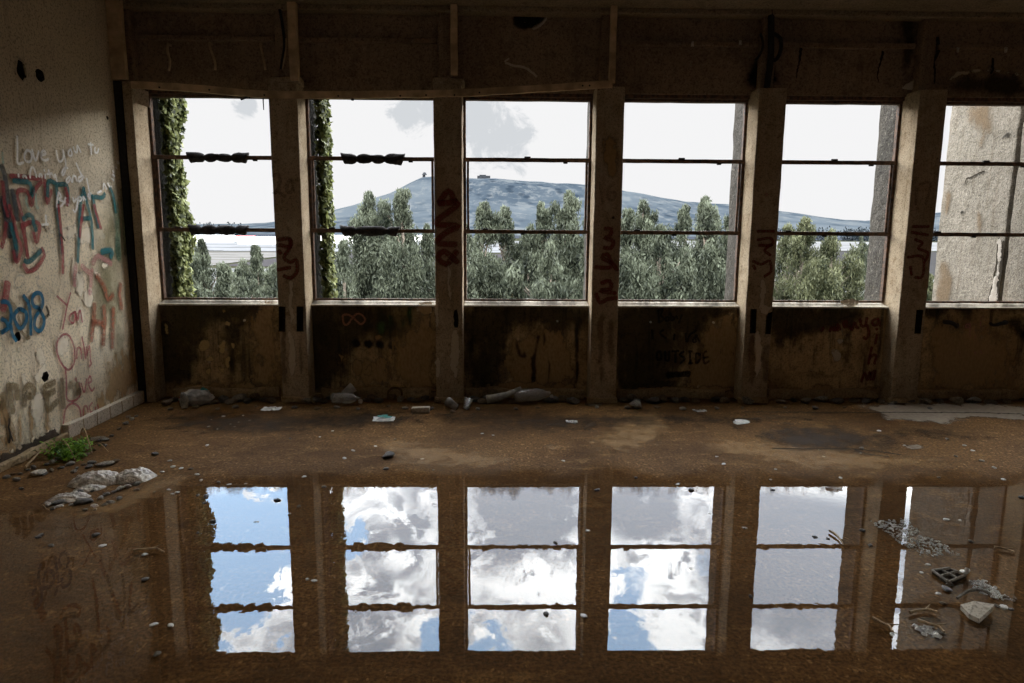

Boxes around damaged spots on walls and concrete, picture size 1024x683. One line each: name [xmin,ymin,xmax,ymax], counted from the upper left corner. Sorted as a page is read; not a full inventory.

leakage [160,295,280,387]
leakage [464,293,589,387]
leakage [0,401,50,455]